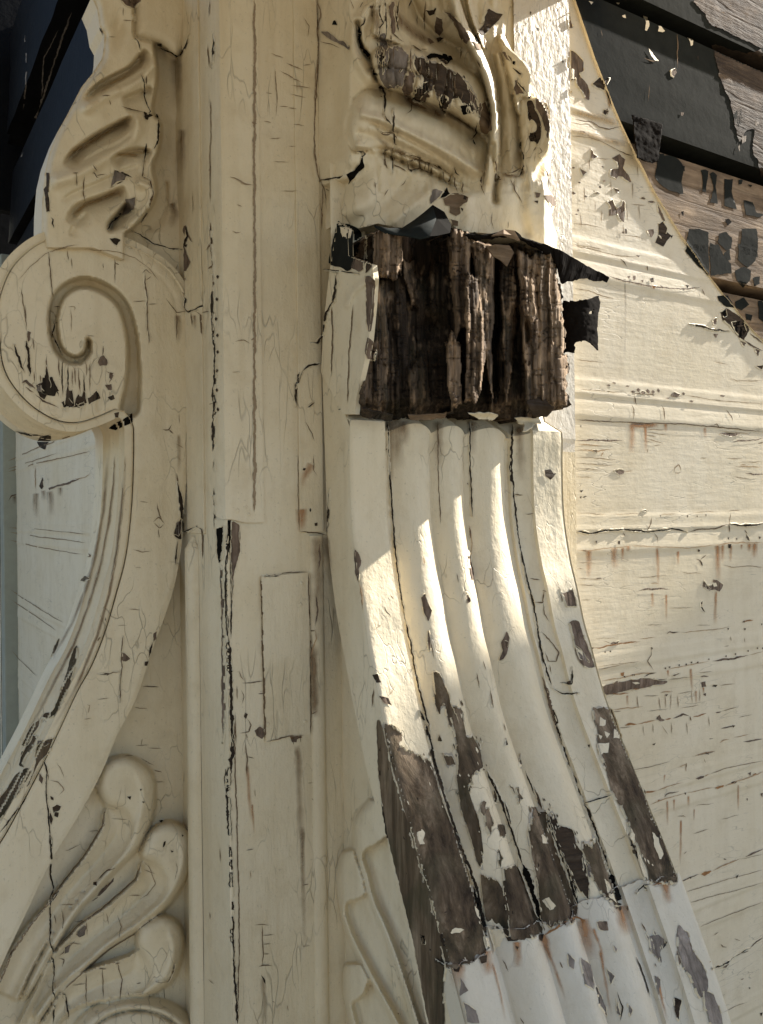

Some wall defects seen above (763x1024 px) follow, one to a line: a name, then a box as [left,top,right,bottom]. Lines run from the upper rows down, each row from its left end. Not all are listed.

peeling [567,50,612,116]
peeling [686,0,763,287]
crack [9,0,528,529]
peeling [329,221,377,361]
peeling [62,355,115,408]
crack [12,591,62,630]
crack [12,528,83,554]
crack [577,509,763,552]
peeling [0,646,79,832]
peeling [376,671,620,1024]
peeling [592,671,731,887]
peeling [636,924,723,1024]